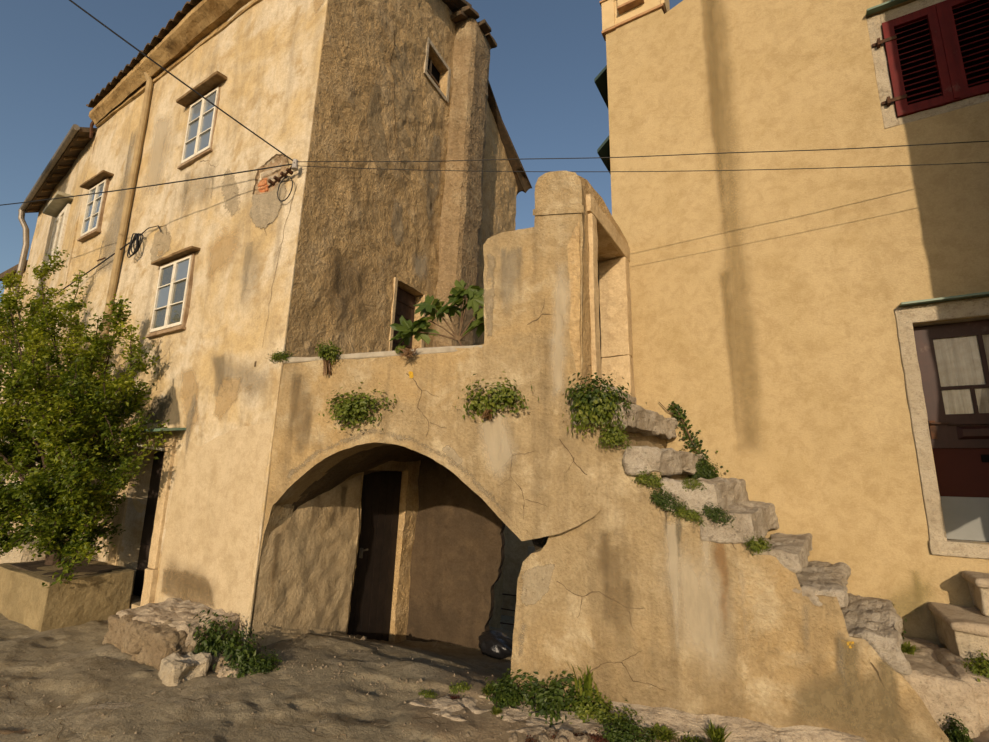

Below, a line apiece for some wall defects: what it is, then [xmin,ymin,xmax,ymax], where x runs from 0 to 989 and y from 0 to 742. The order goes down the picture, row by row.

peeling [210,170,239,215]
peeling [250,154,289,229]
crack [557,581,666,691]